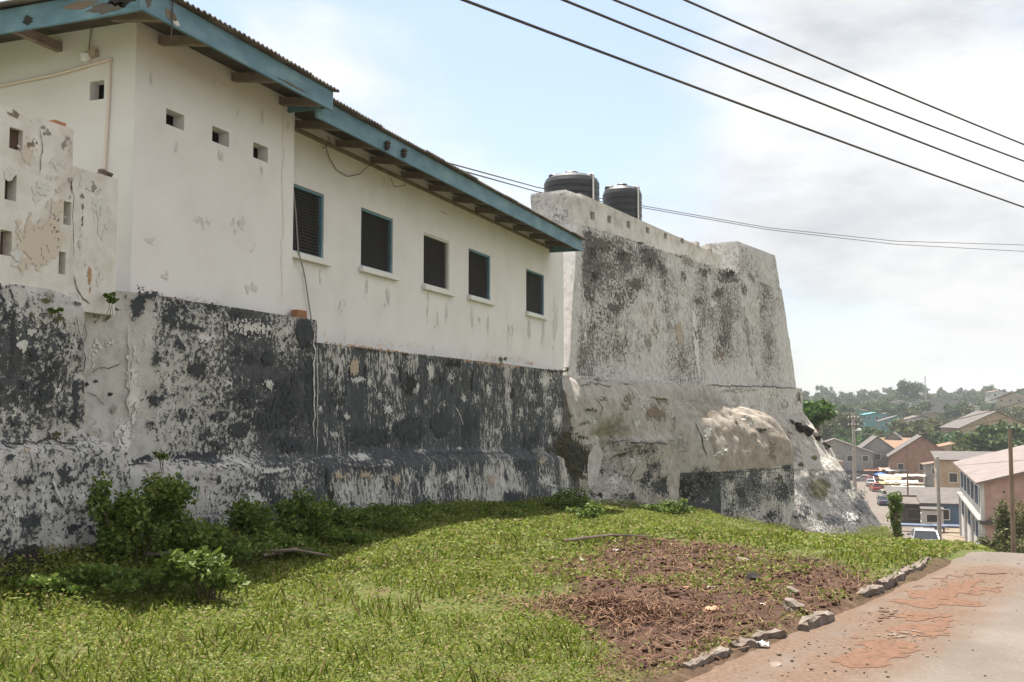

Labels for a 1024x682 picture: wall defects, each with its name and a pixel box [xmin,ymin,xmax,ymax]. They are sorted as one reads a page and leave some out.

flaking render [10,176,66,277]
damp [581,231,774,372]
peeling [86,329,141,451]
damp [322,331,548,396]
peeling [325,429,459,508]